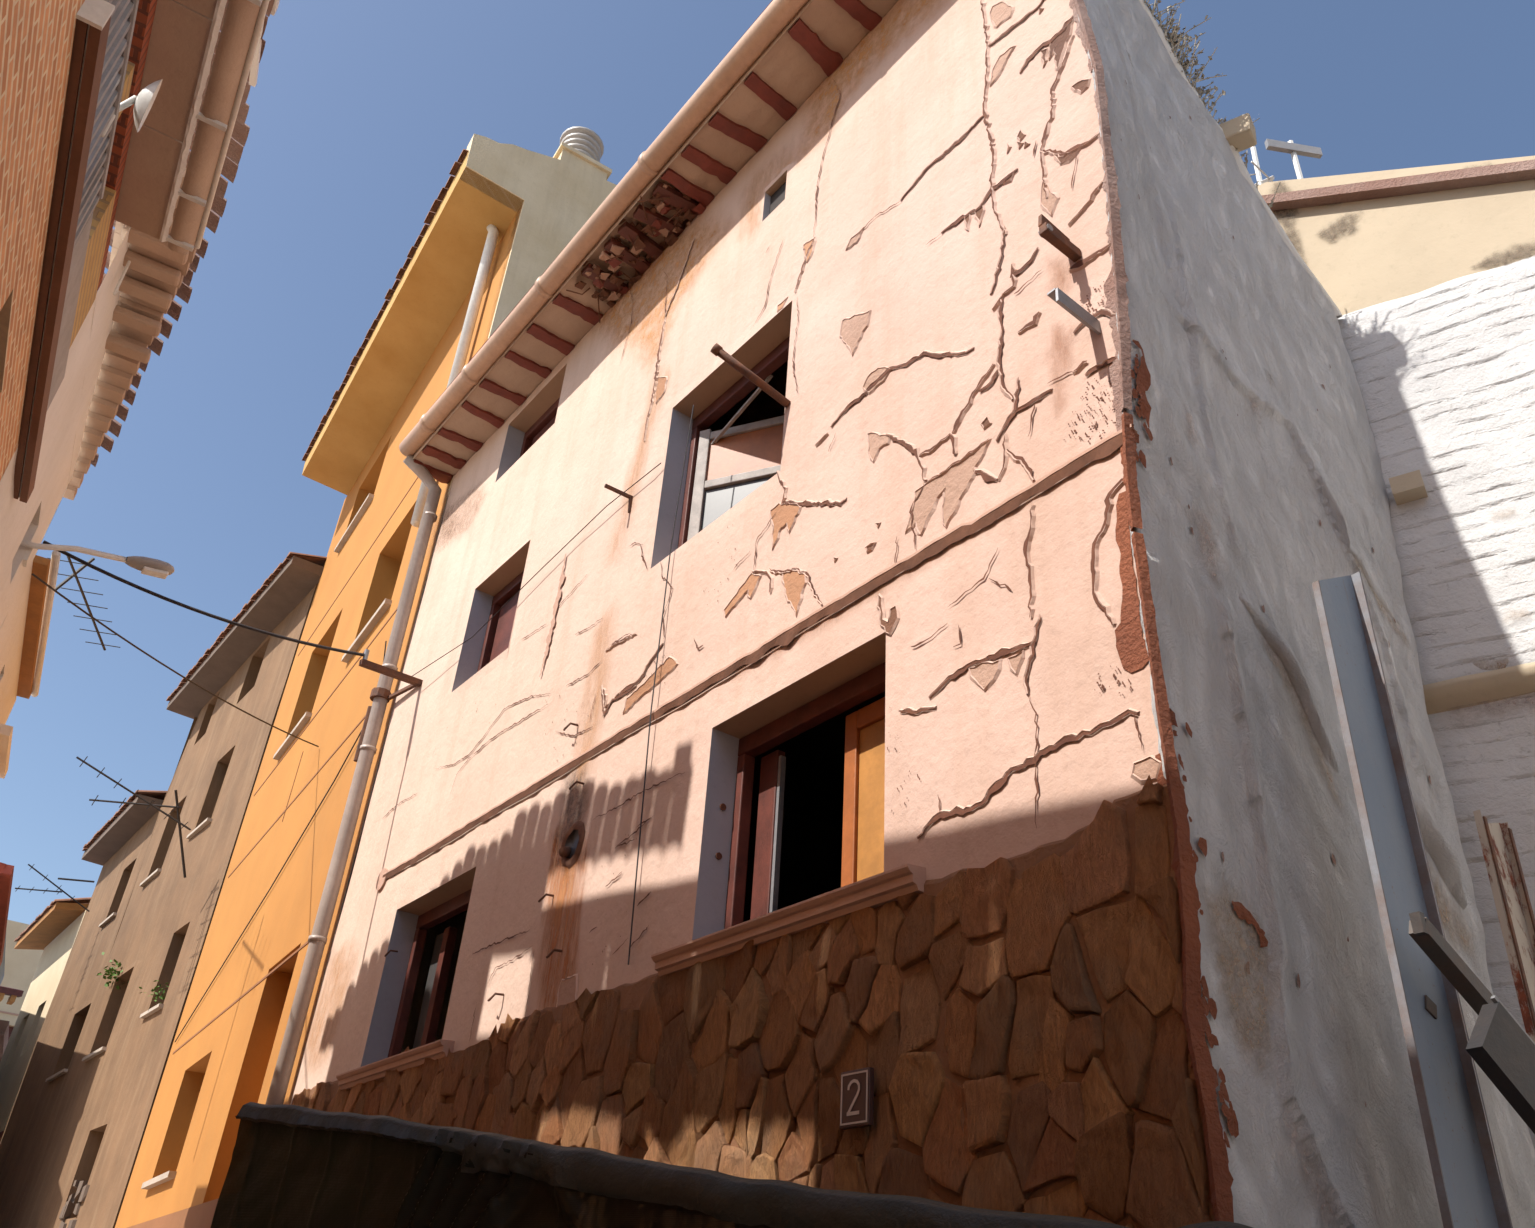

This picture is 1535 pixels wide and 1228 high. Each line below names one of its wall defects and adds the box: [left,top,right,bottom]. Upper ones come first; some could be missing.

crack [755,80,841,393]
crack [620,239,694,441]
crack [815,0,1142,839]
crack [383,542,703,818]
corrosion [383,433,1123,879]
crack [735,470,847,605]
flaking render [1040,0,1239,1222]
crack [470,929,534,1038]
corrosion [543,833,584,1009]
crack [589,772,685,955]
spalling [1232,901,1268,948]